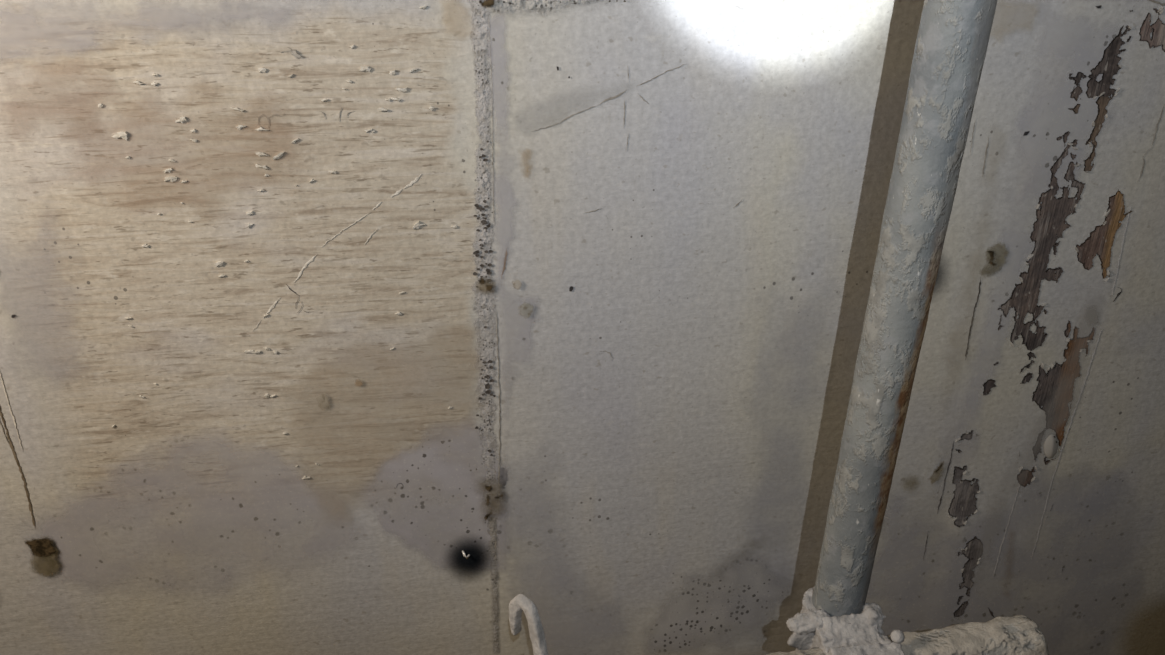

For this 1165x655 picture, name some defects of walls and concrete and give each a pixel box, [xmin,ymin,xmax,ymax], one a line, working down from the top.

spalling [982,243,1008,275]
peeling [998,8,1165,487]
peeling [983,362,998,395]
crack [0,373,35,526]
leakage [377,430,505,568]
peeling [931,463,979,528]
peeling [954,536,983,617]